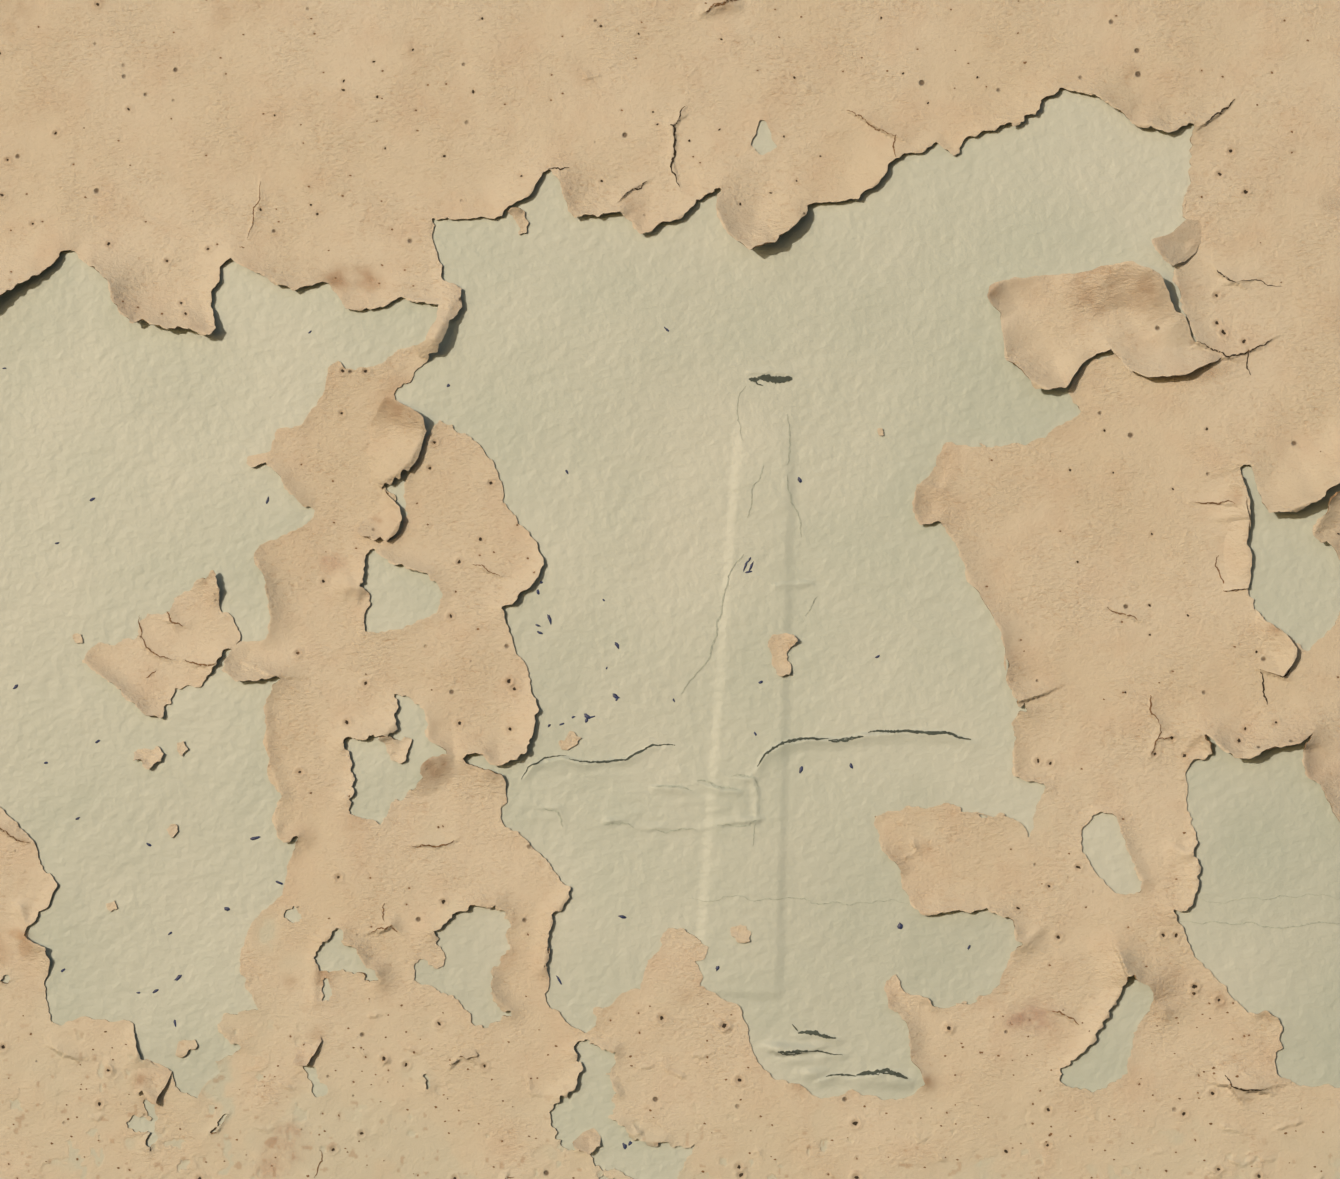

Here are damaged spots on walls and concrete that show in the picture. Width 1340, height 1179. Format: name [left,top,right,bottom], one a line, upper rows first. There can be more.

peeling [0,225,441,1151]
crack [521,744,675,779]
peeling [326,68,1222,1100]
crack [604,729,971,844]
peeling [1162,704,1340,1088]
peeling [1210,411,1340,677]
peeling [550,1040,695,1179]
crack [778,1024,908,1079]